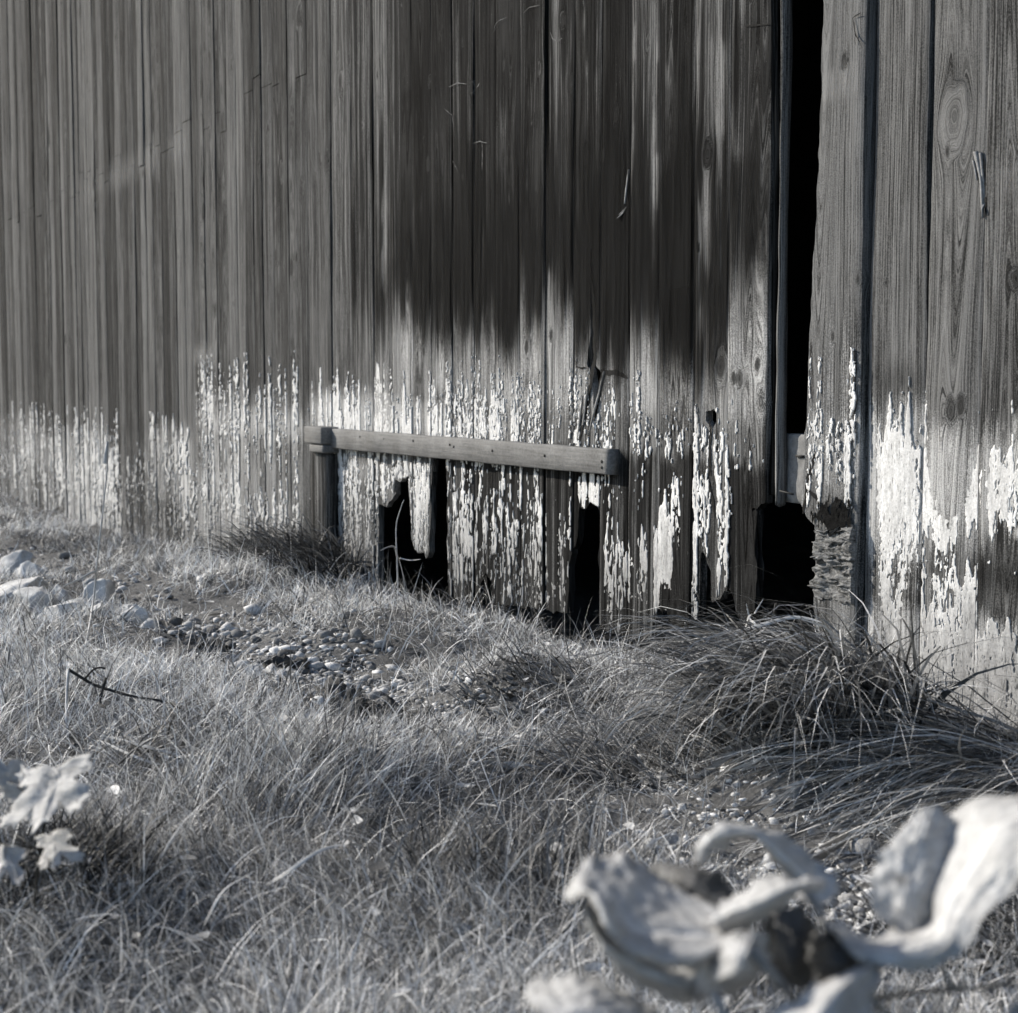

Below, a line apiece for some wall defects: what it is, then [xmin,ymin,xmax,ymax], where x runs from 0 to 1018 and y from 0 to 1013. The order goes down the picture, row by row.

peeling [0,350,764,632]
peeling [807,526,847,588]
peeling [806,347,856,509]
peeling [876,376,1018,731]